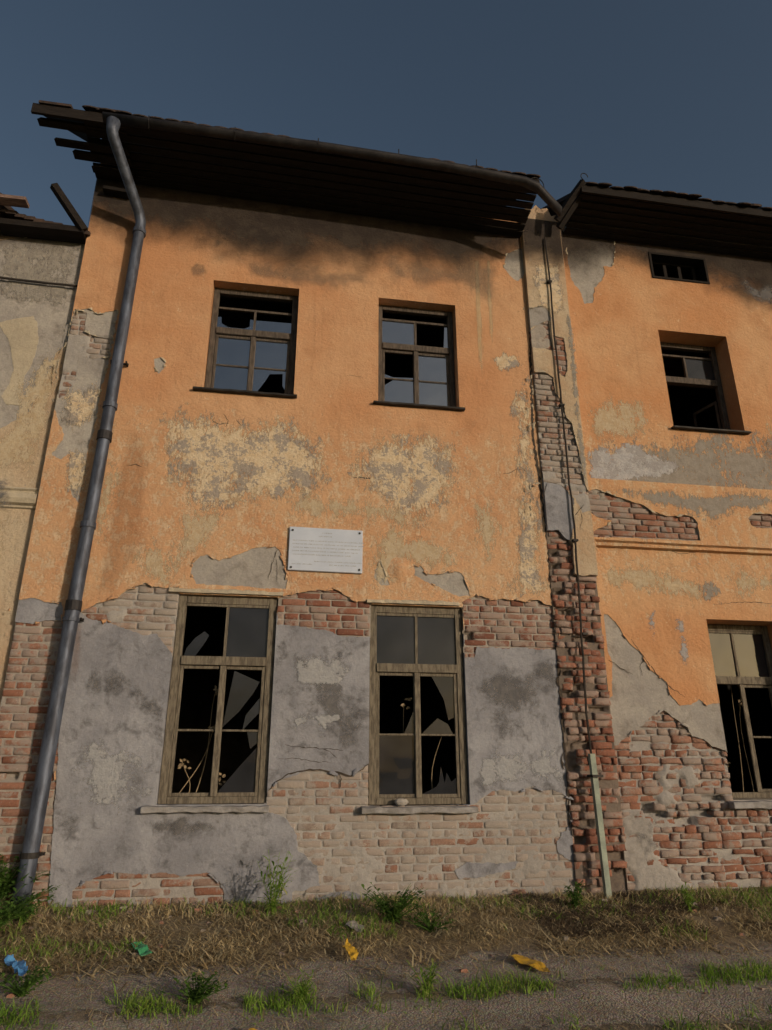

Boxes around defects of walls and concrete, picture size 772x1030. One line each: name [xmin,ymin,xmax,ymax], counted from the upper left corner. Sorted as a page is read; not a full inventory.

spalling [0,208,64,225]
flaking render [0,231,119,503]
peeling [96,462,120,540]
peeling [159,403,331,513]
spalling [82,582,180,657]
spalling [190,545,371,637]
spalling [264,226,772,903]
spalling [72,871,224,907]